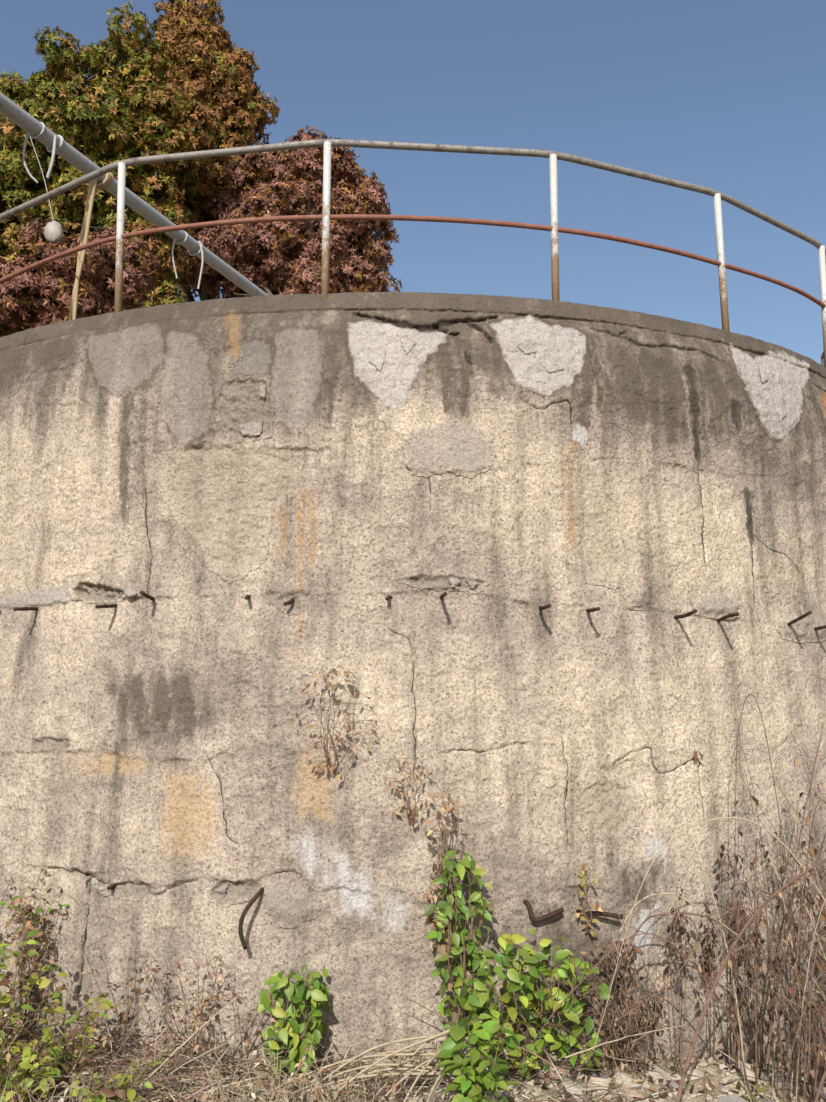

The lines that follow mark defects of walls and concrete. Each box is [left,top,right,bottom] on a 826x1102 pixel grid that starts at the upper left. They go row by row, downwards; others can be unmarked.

peeling [347,319,451,412]
peeling [489,313,587,397]
peeling [728,342,811,441]
rust [815,384,826,419]
rust [273,470,322,680]
damp [739,483,756,552]
crack [749,525,805,600]
damp [97,653,225,757]
crack [207,756,239,846]
crack [614,747,704,811]